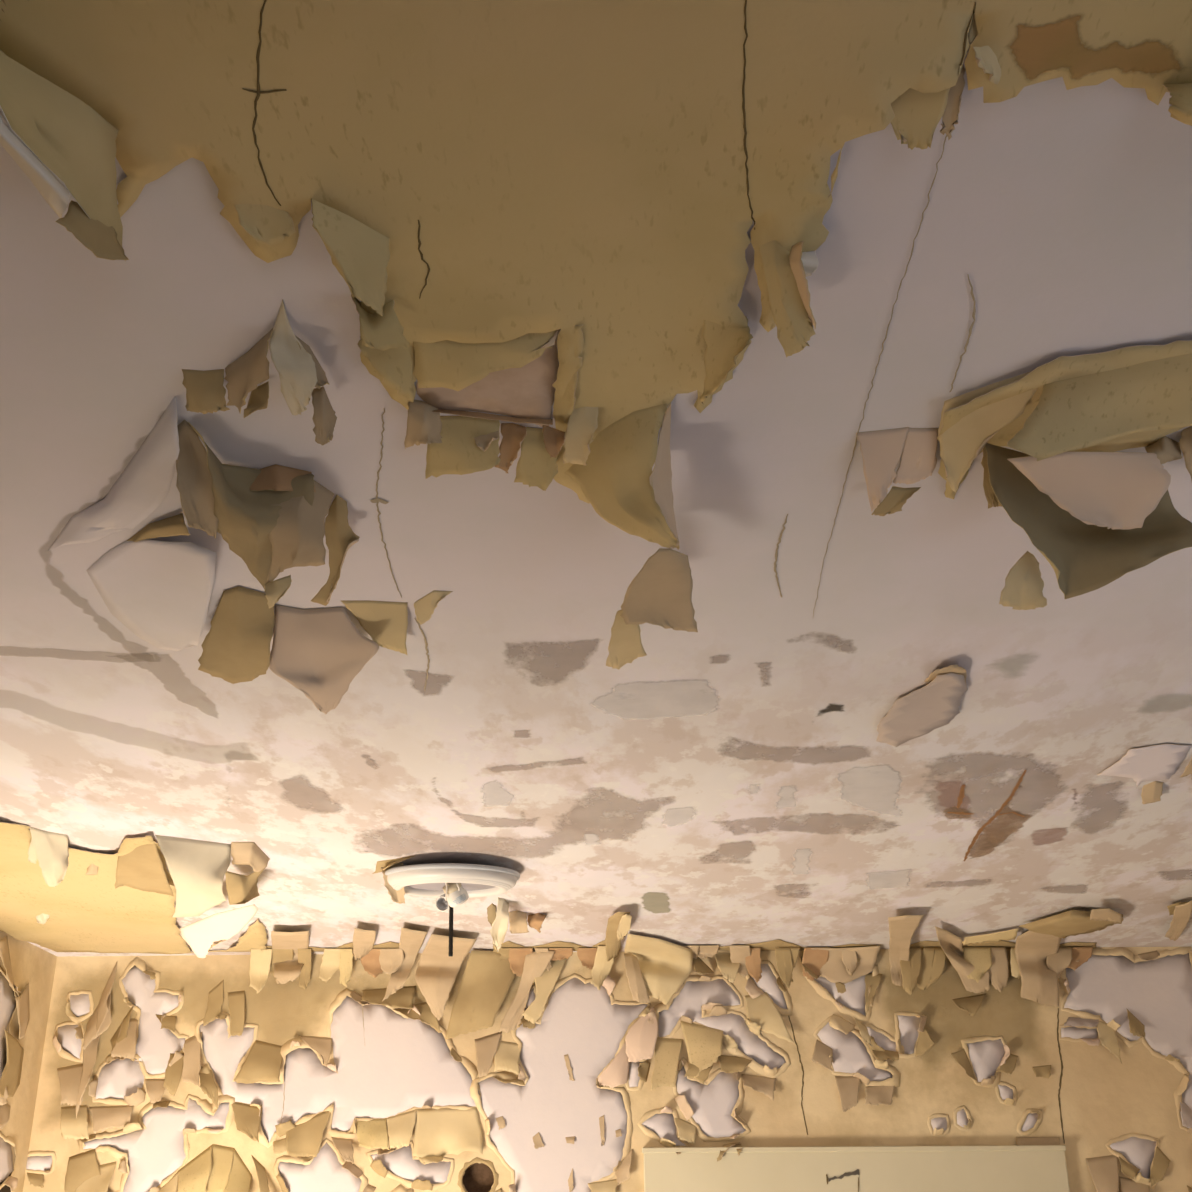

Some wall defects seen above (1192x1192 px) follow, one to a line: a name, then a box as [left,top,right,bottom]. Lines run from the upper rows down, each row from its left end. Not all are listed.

crack [242,0,287,206]
crack [742,0,755,230]
peeling [0,0,1192,714]
crack [813,135,947,616]
crack [370,408,430,691]
crack [774,514,788,597]
water stain [820,704,843,713]
flaking render [1098,744,1192,804]
peeling [0,822,1192,1192]
water stain [642,892,670,913]